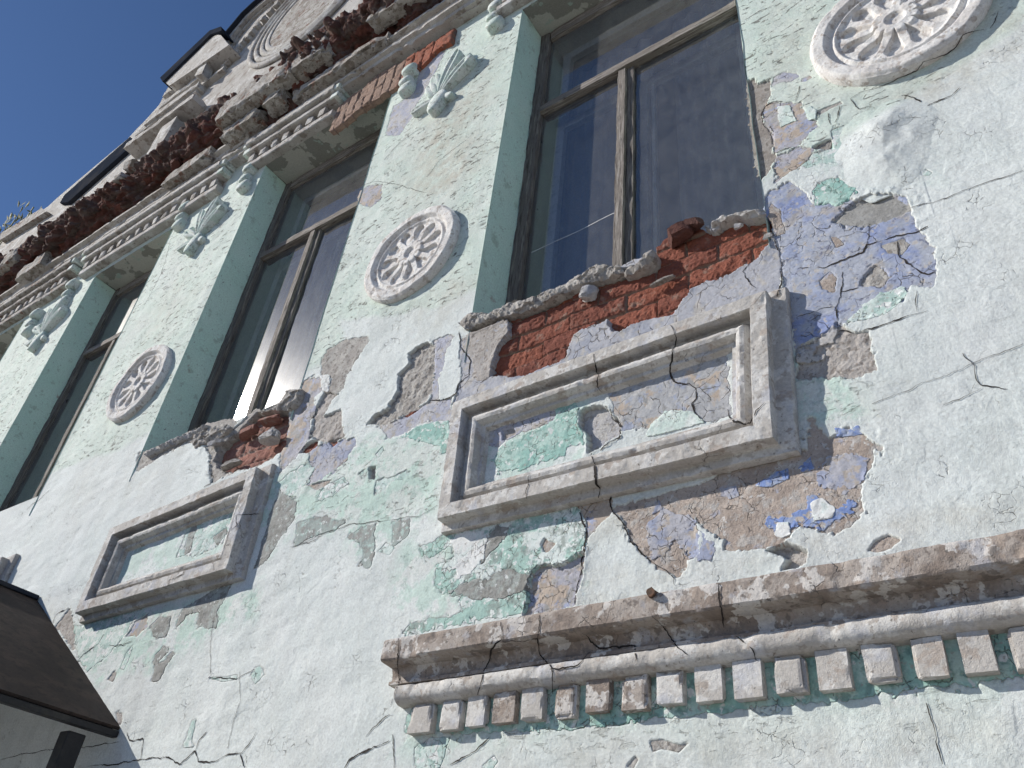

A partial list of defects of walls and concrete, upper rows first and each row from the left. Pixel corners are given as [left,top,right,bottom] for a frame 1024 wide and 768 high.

flaking render [329,28,457,136]
spalling [170,157,183,172]
peeling [357,185,382,207]
flaking render [372,72,937,475]
crack [742,170,1023,333]
flaking render [137,337,369,502]
crack [574,354,674,604]
peeling [403,417,883,636]
crack [872,344,1022,405]
peeling [152,646,174,682]
crack [82,626,255,766]
crack [477,611,637,695]